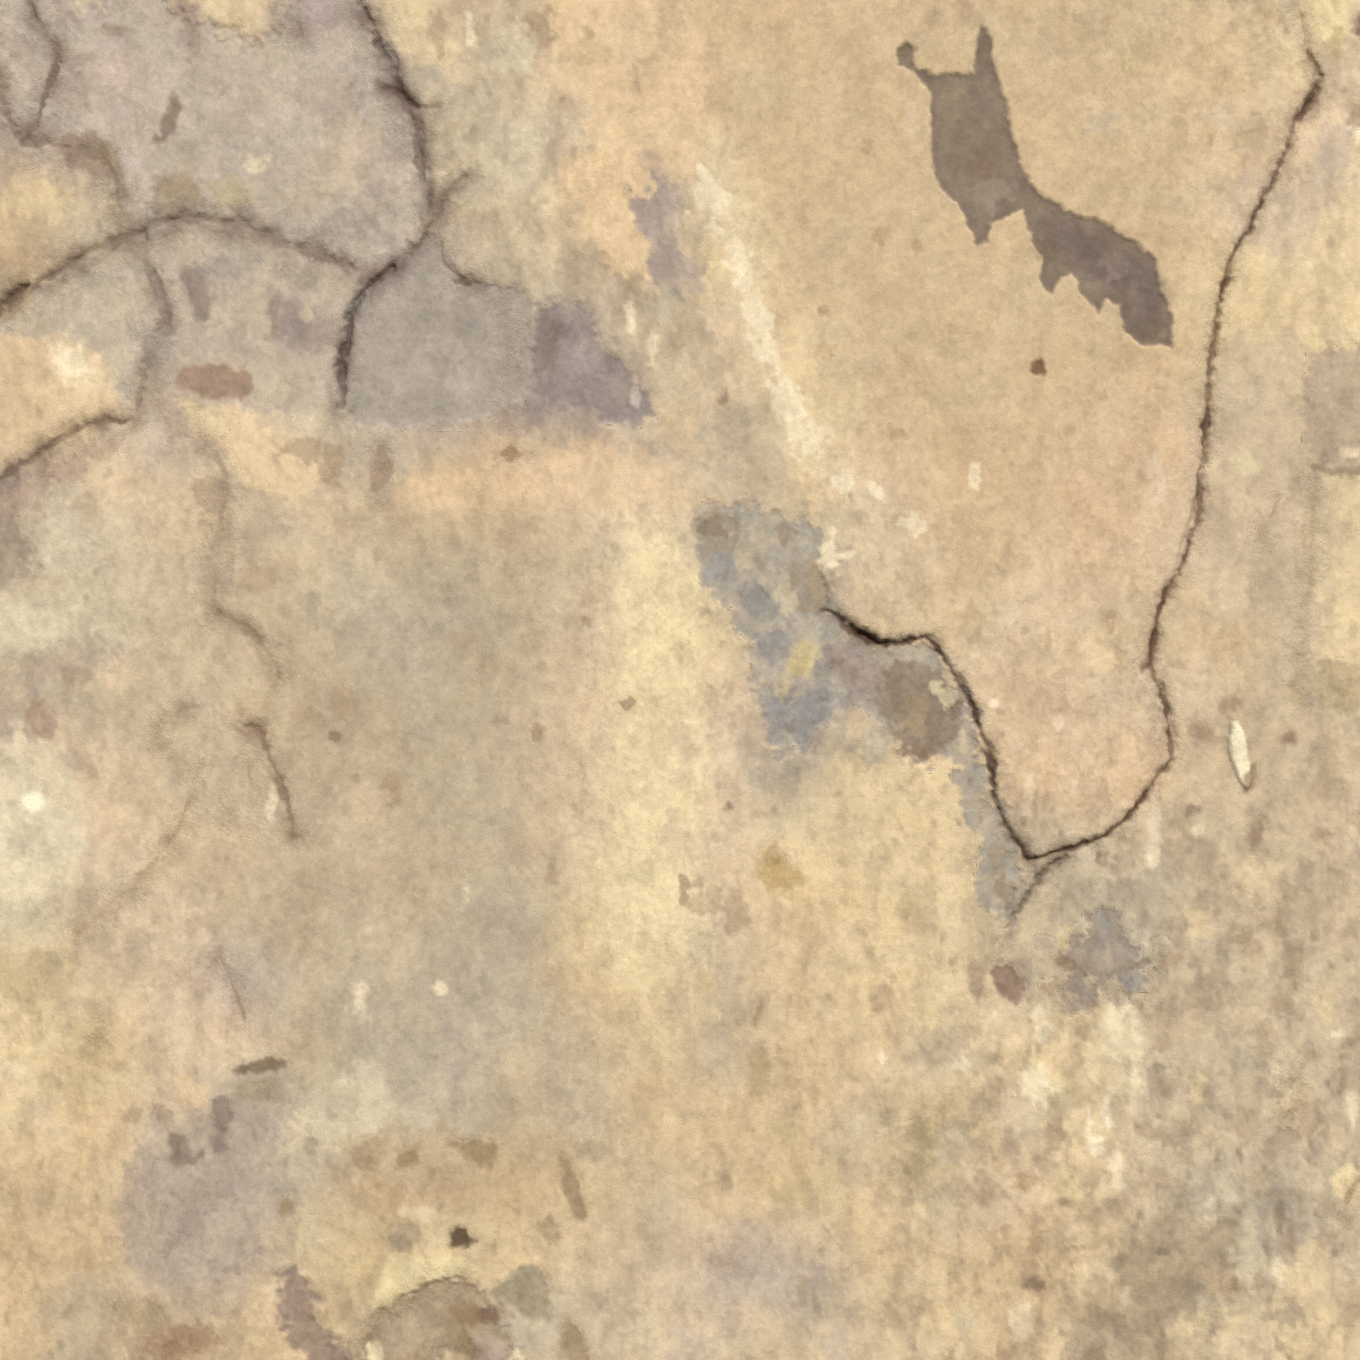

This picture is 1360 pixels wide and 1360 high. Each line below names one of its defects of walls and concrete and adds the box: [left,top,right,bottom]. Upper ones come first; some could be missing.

crack [0,0,540,956]
crack [809,0,1333,949]
crack [1272,1051,1309,1133]
crack [1324,1162,1360,1232]